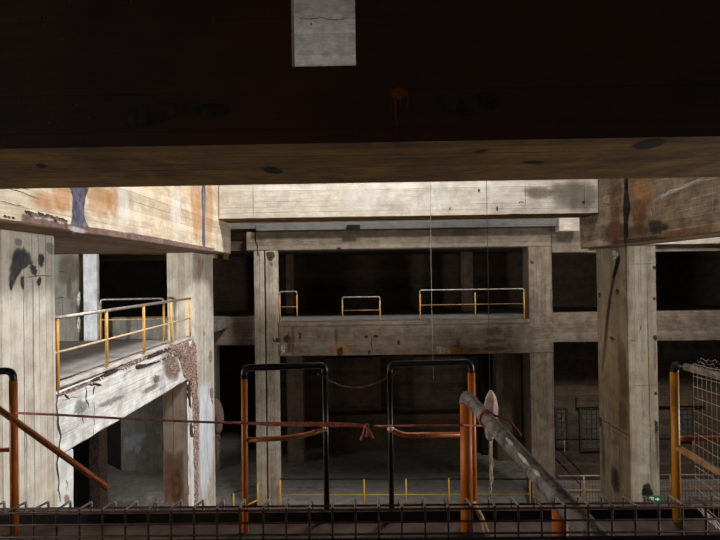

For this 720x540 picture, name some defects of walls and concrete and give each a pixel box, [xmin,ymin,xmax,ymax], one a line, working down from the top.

crack [296,16,355,25]
damp [9,239,54,290]
damp [603,256,620,361]
rust [615,220,666,244]
crack [56,370,111,502]
spalling [57,340,199,506]